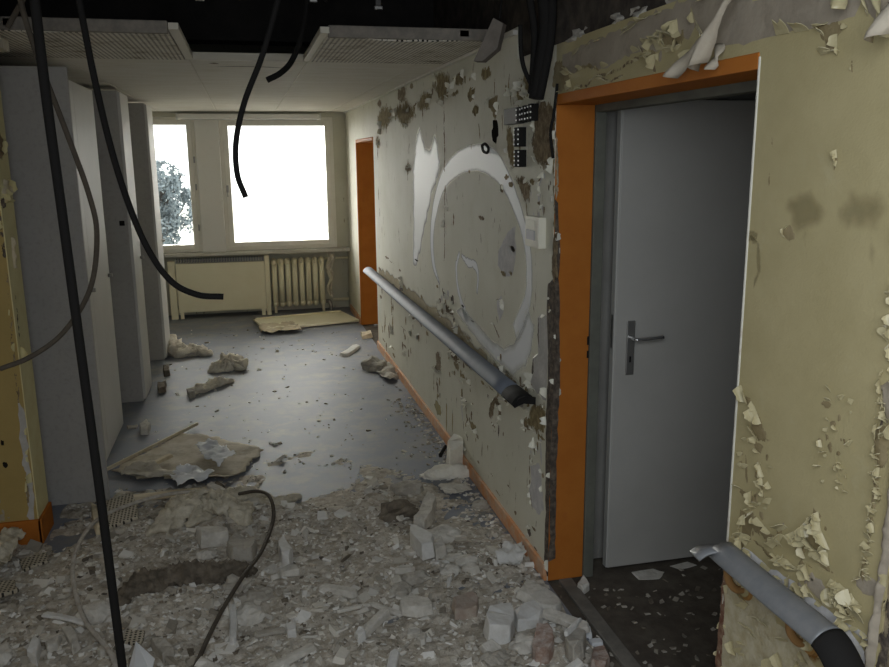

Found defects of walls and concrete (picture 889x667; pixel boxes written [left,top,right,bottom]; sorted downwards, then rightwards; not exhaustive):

peeling [573,0,889,91]
flaking render [0,179,18,284]
flaking render [8,309,35,520]
flaking render [375,61,561,576]
flaking render [713,575,819,667]
flaking render [731,380,889,667]